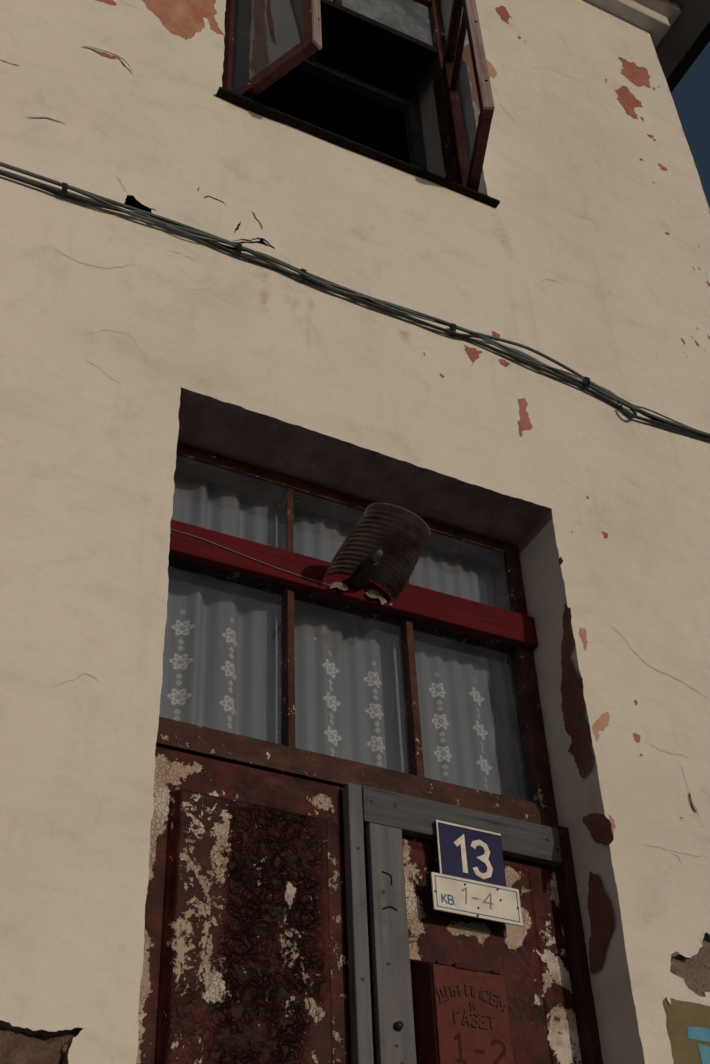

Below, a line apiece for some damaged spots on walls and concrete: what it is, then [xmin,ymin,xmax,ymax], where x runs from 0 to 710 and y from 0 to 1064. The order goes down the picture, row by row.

peeling [142,0,226,40]
peeling [495,5,512,24]
peeling [605,57,660,122]
flaking render [116,177,157,213]
peeling [464,345,482,363]
peeling [518,398,533,437]
peeling [560,604,610,779]
peeling [582,813,616,846]
flaking render [670,926,710,997]
flaking render [0,1020,84,1064]